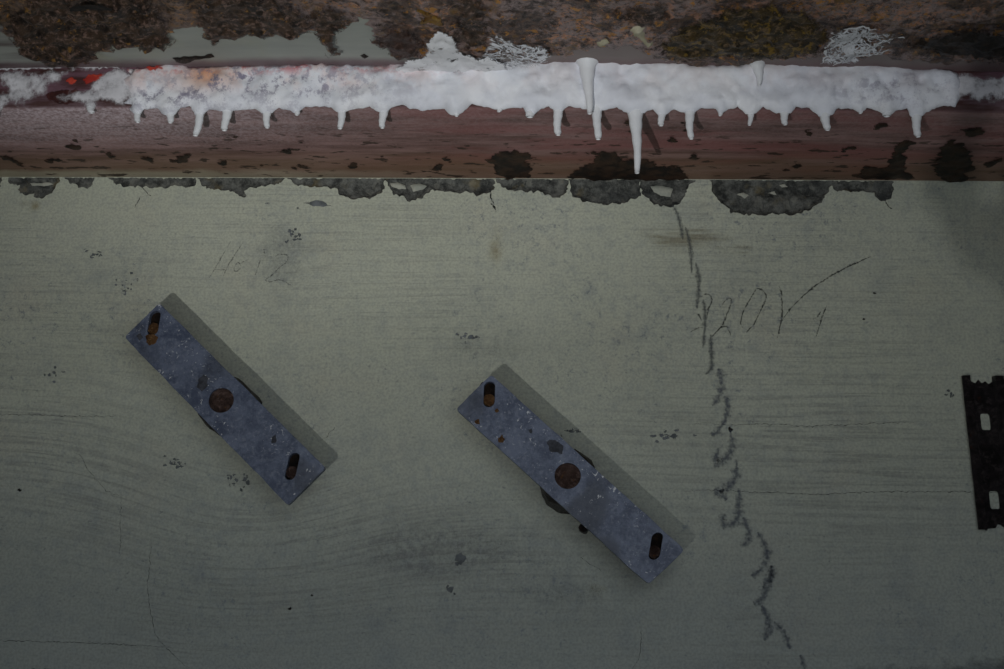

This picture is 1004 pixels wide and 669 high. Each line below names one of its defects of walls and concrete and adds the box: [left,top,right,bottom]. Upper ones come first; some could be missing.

corrosion [0,0,1004,69]
water stain [124,26,961,174]
spalling [0,177,94,199]
peeling [297,200,331,209]
spalling [109,178,696,207]
spalling [710,180,894,216]